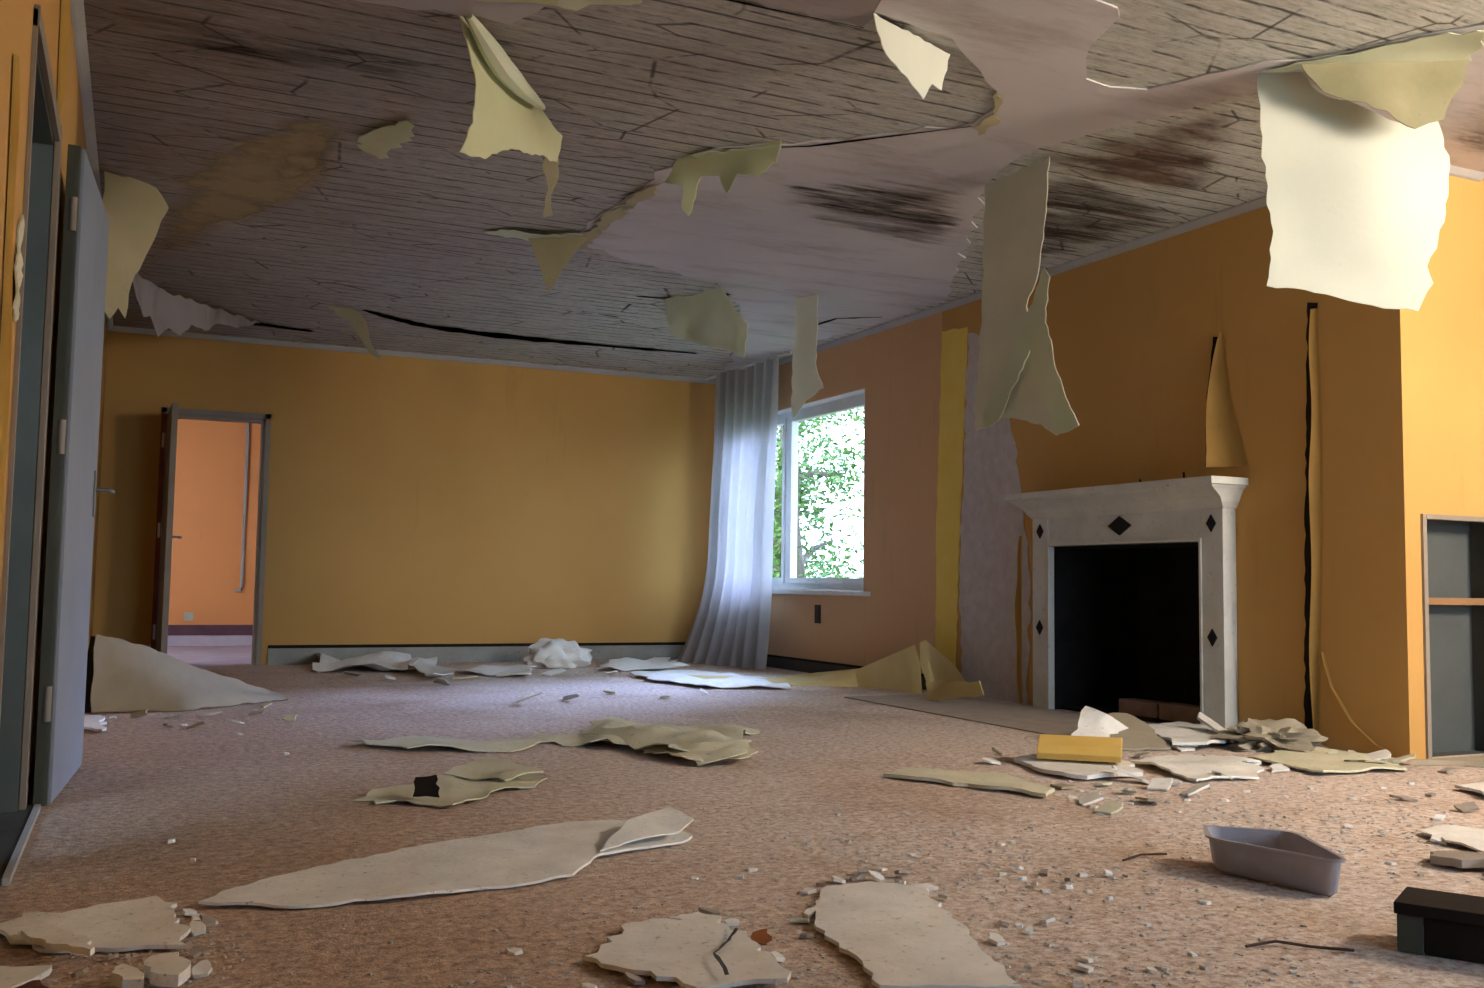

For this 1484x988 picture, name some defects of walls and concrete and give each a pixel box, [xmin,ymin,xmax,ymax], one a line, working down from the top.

damp [791,185,951,240]
damp [1041,120,1217,254]
crack [253,323,312,332]
crack [362,310,697,354]